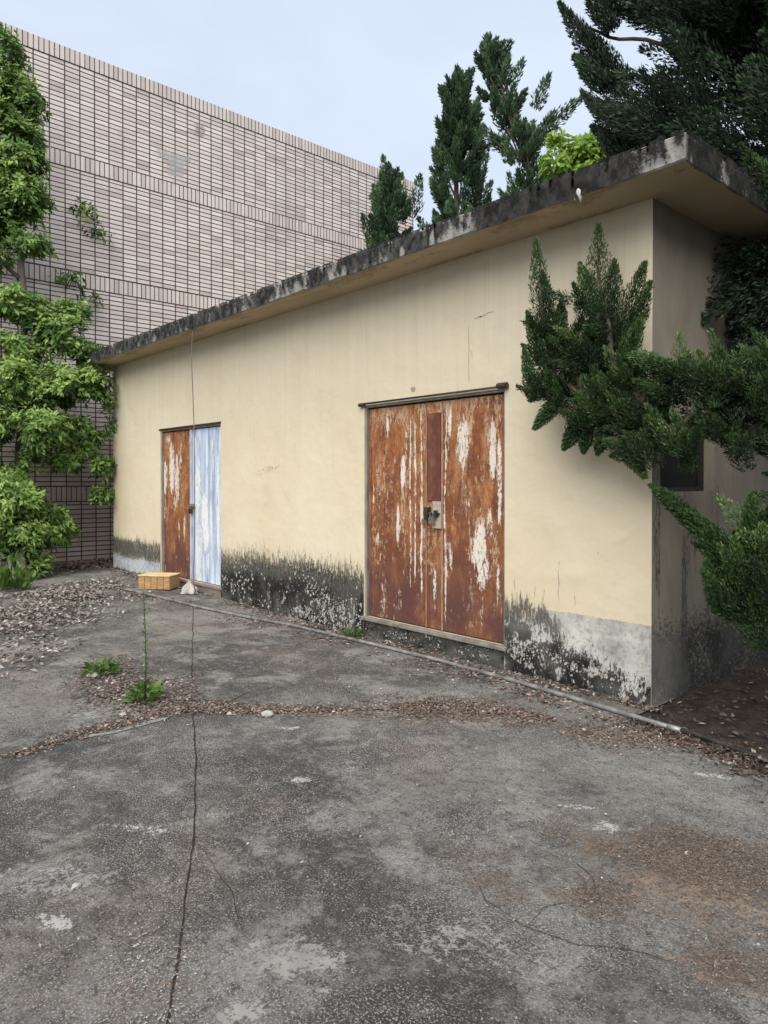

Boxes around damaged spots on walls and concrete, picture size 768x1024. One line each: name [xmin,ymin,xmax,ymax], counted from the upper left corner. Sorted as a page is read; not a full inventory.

leakage [76,129,767,366]
leakage [113,536,160,574]
leakage [221,501,768,705]
crack [7,603,459,1024]